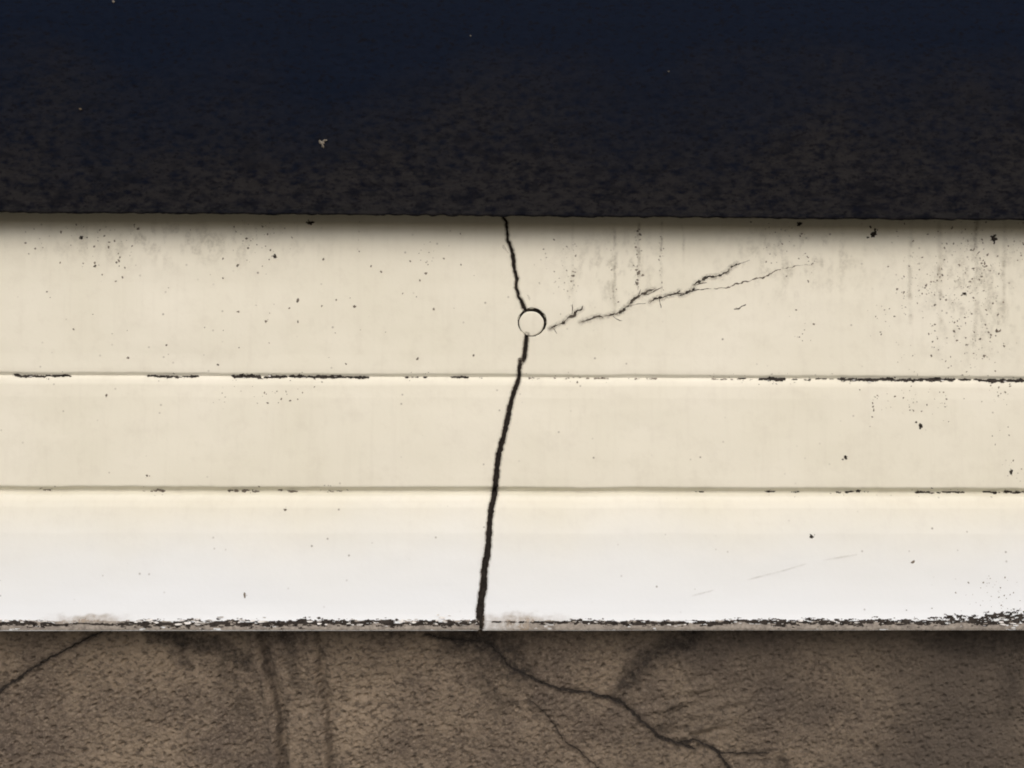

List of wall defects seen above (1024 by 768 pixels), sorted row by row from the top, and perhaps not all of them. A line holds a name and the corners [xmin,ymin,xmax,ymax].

mould [867,221,1024,372]
crack [426,217,807,768]
peeling [0,600,1024,630]